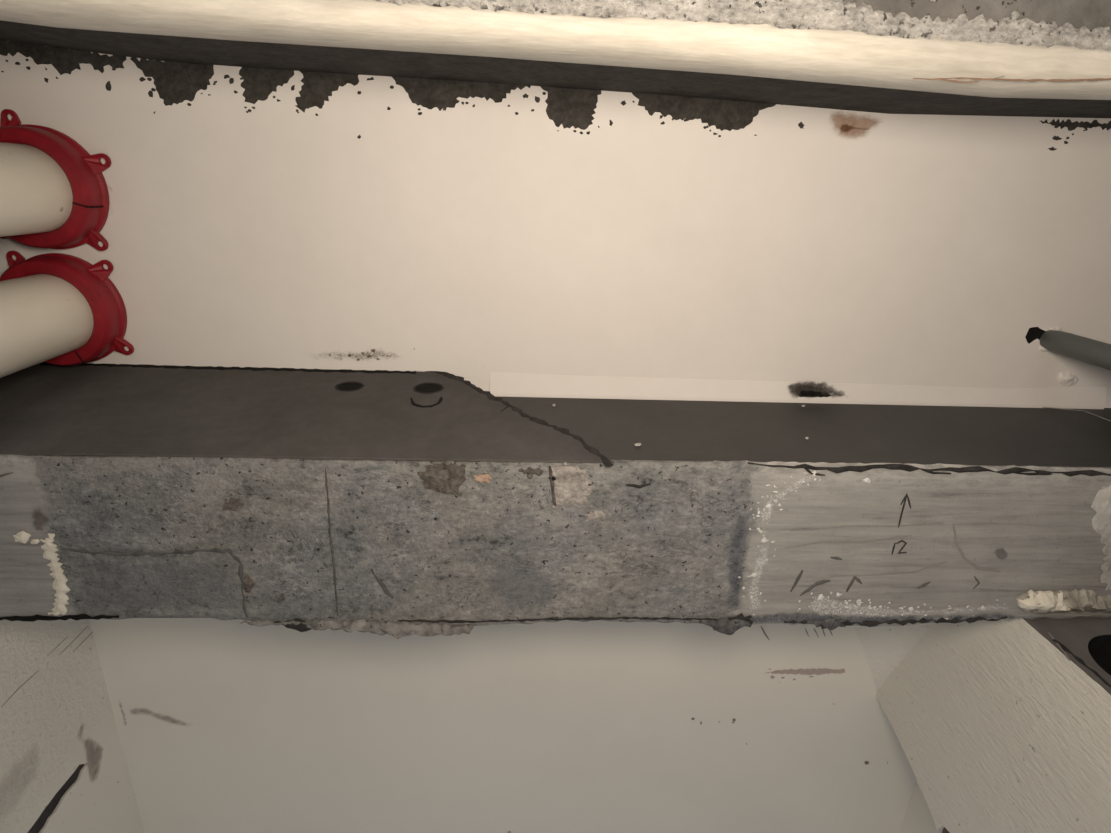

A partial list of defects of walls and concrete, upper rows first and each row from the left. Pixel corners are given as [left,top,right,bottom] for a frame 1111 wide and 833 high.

peeling [0,40,374,116]
peeling [390,77,613,135]
peeling [621,93,776,137]
rust [833,115,876,136]
peeling [1040,119,1111,151]
flaking render [789,382,843,407]
spalling [417,460,492,496]
crack [61,548,248,617]
spalling [728,613,753,627]